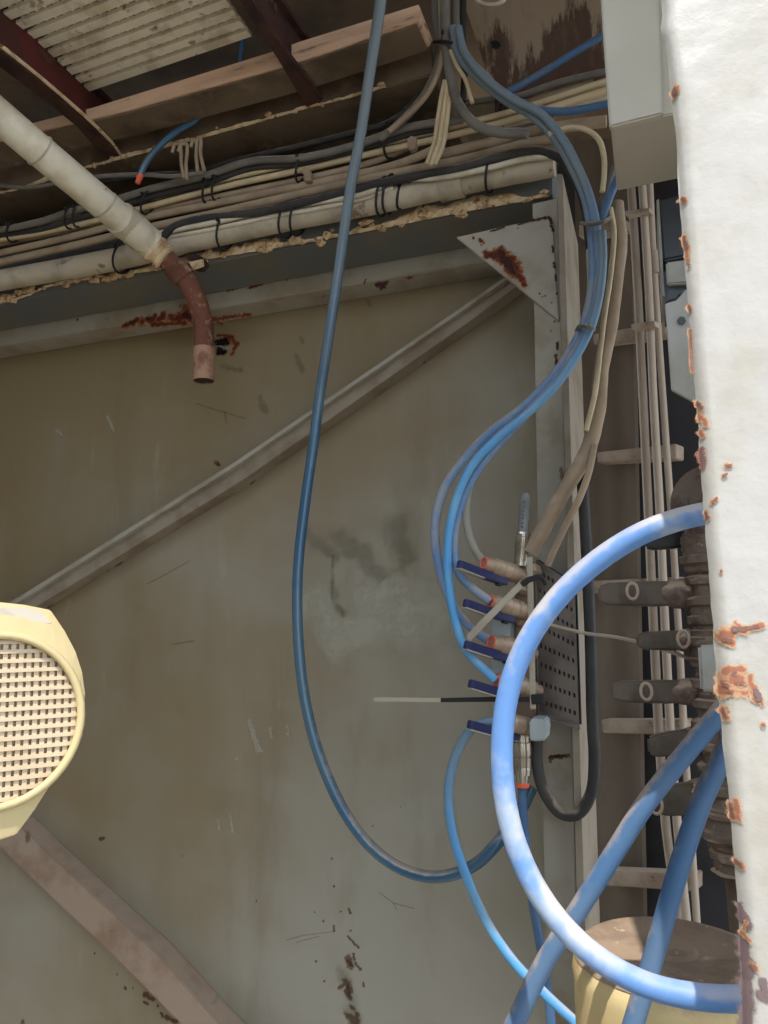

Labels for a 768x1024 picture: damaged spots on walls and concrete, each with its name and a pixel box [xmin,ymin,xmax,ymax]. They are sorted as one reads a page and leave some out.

corrosion [180,189,549,272]
corrosion [0,264,161,304]
corrosion [472,236,528,288]
corrosion [122,304,193,329]
corrosion [694,400,709,469]
corrosion [703,496,719,520]
corrosion [714,620,766,648]
corrosion [714,664,765,721]
corrosion [338,930,365,1024]